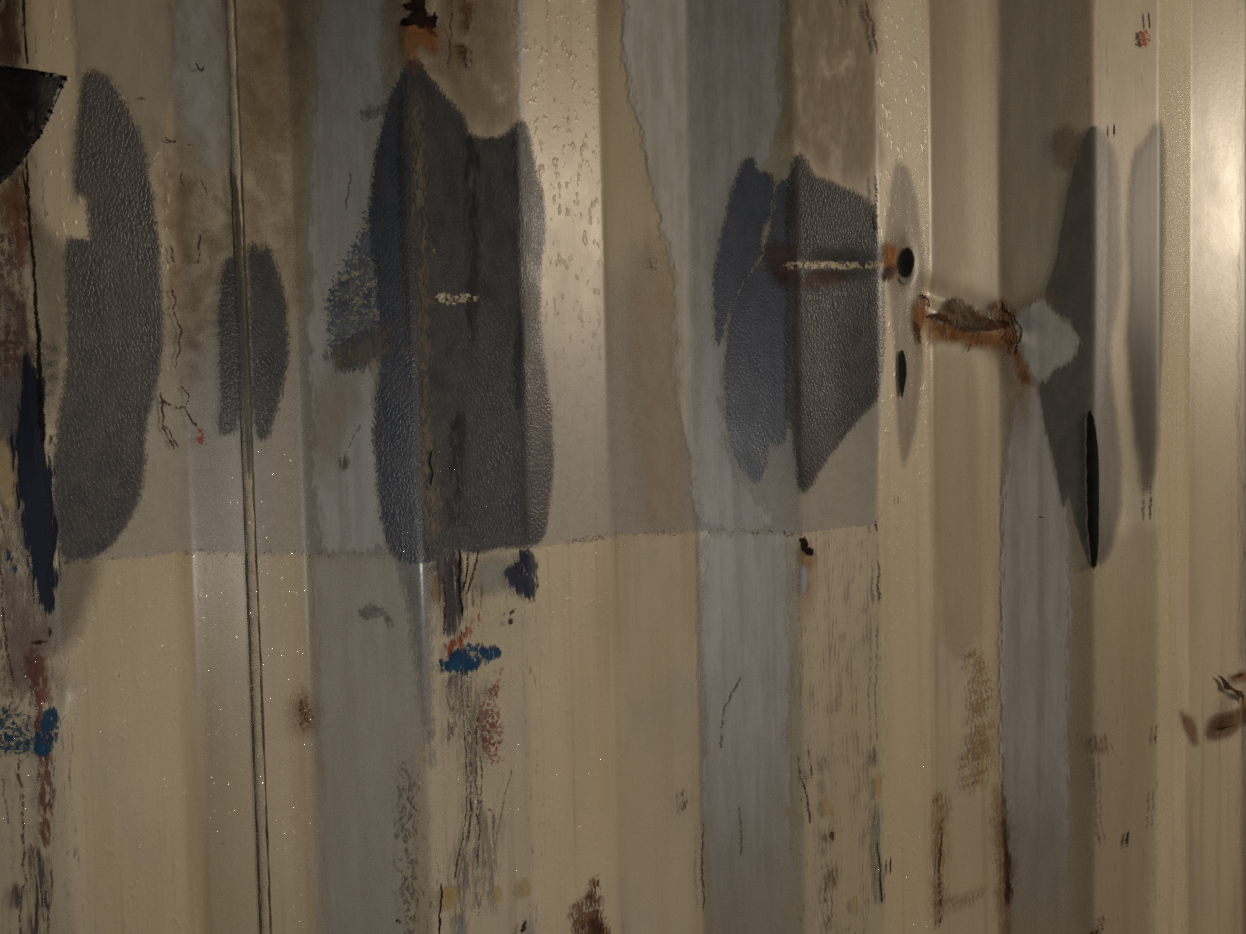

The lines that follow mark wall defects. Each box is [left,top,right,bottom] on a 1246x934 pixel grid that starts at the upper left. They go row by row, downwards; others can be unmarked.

rust [913,294,1030,383]
rust [1183,672,1246,743]
rust [571,878,611,934]